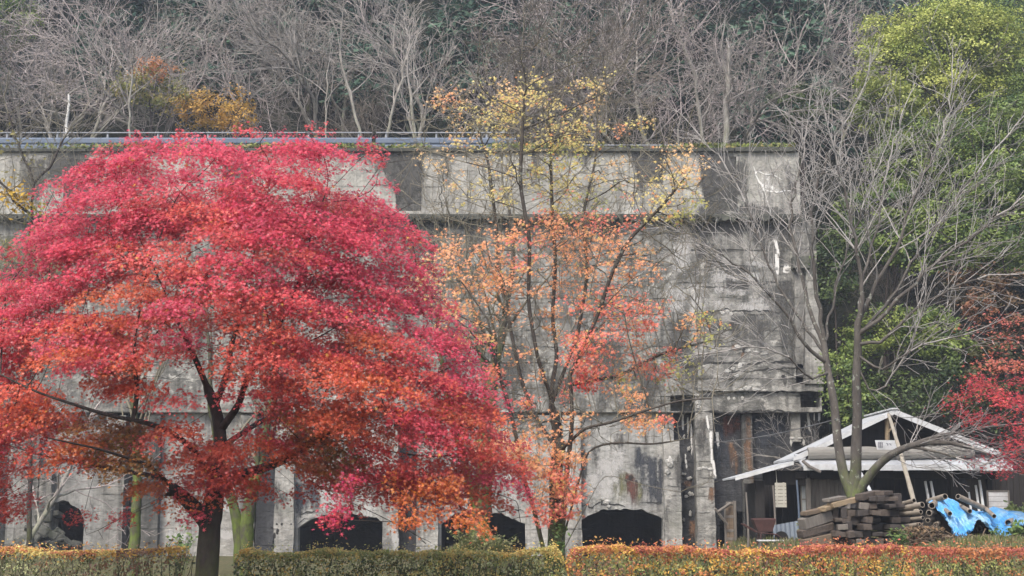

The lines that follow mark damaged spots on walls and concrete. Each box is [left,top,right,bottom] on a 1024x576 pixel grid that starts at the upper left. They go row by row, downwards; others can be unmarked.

water stain [580,448,599,484]
water stain [614,414,730,520]
rust [625,474,638,502]